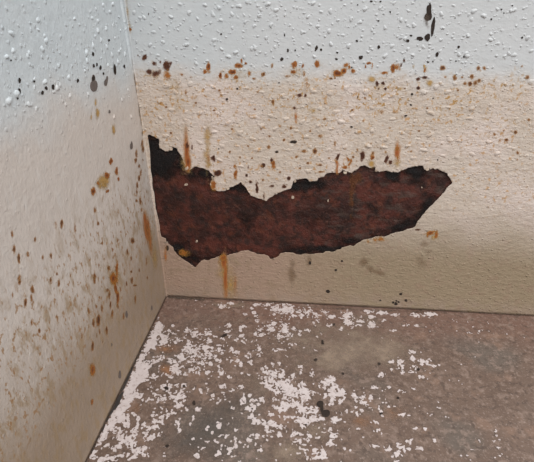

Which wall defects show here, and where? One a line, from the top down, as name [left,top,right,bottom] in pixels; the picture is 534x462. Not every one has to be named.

corrosion [146,61,172,79]
corrosion [219,59,247,79]
corrosion [329,63,355,79]
corrosion [91,158,120,195]
corrosion [184,136,193,171]
corrosion [328,149,375,174]
peeling [148,135,452,267]
corrosion [143,213,152,249]
corrosion [106,261,137,318]
corrosion [219,254,236,295]
leakage [181,421,222,446]